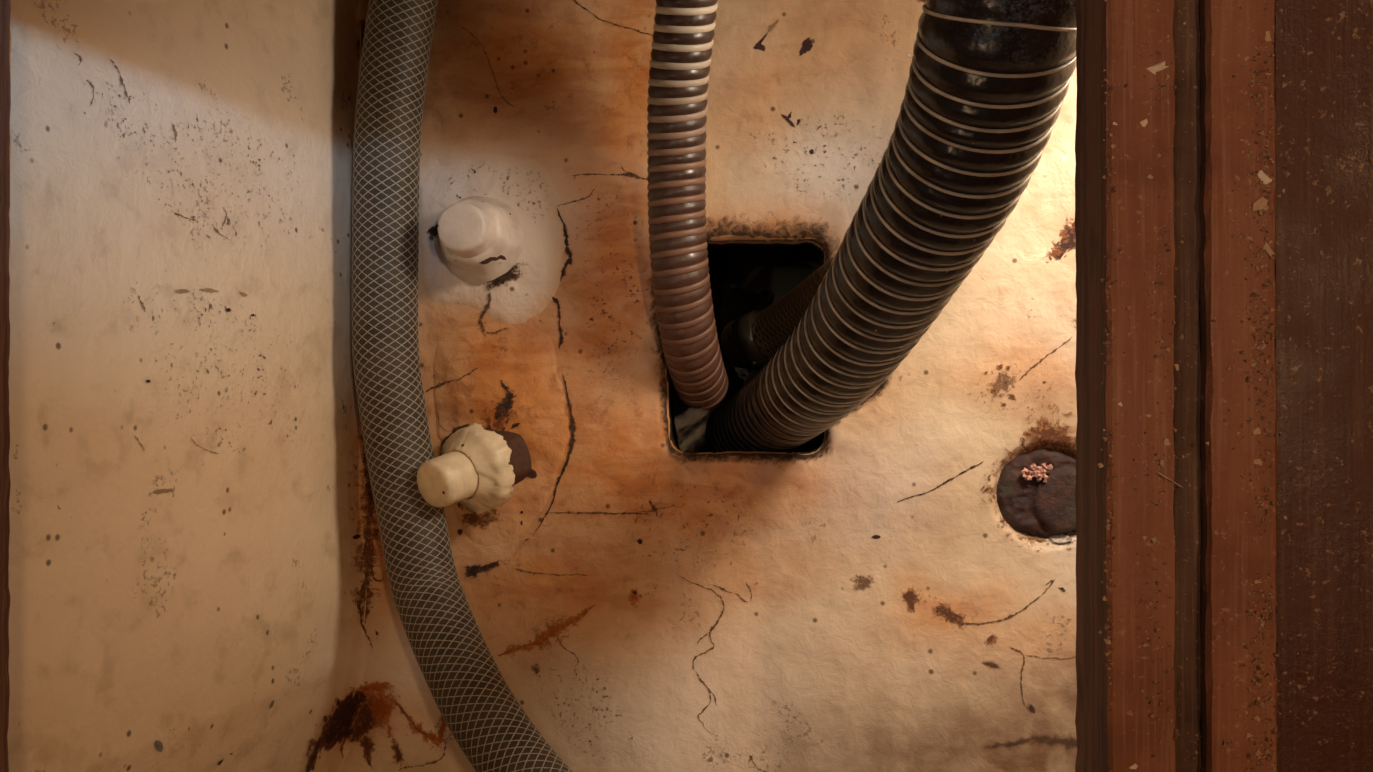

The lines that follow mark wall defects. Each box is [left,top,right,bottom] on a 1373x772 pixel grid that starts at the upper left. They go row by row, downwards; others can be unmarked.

rust [427,222,438,240]
rust [477,263,527,334]
crack [525,164,673,541]
crack [1018,337,1072,381]
rust [441,380,520,446]
rust [980,405,1077,502]
rust [457,504,499,535]
rust [498,605,594,674]
crack [680,576,752,736]
crack [937,579,1076,713]
rust [306,682,447,772]
damp [985,735,1077,749]